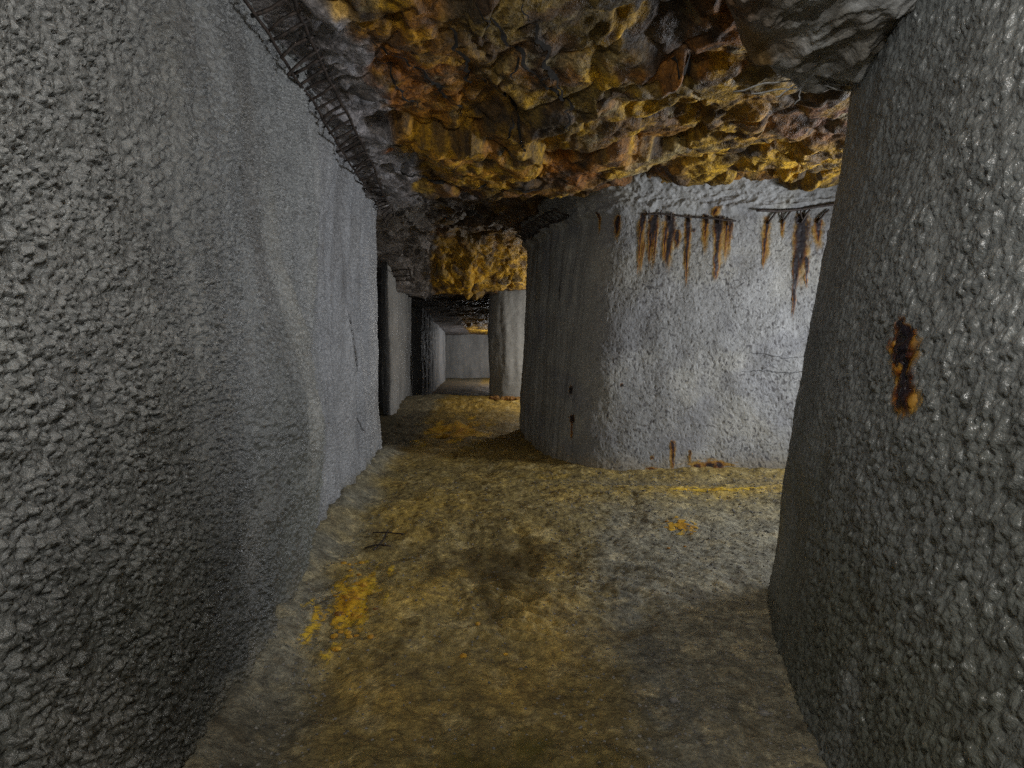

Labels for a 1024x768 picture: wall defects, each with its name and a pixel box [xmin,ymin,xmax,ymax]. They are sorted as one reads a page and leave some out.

corrosion [637,206,733,282]
corrosion [762,215,823,313]
corrosion [886,317,922,416]
corrosion [670,441,735,469]